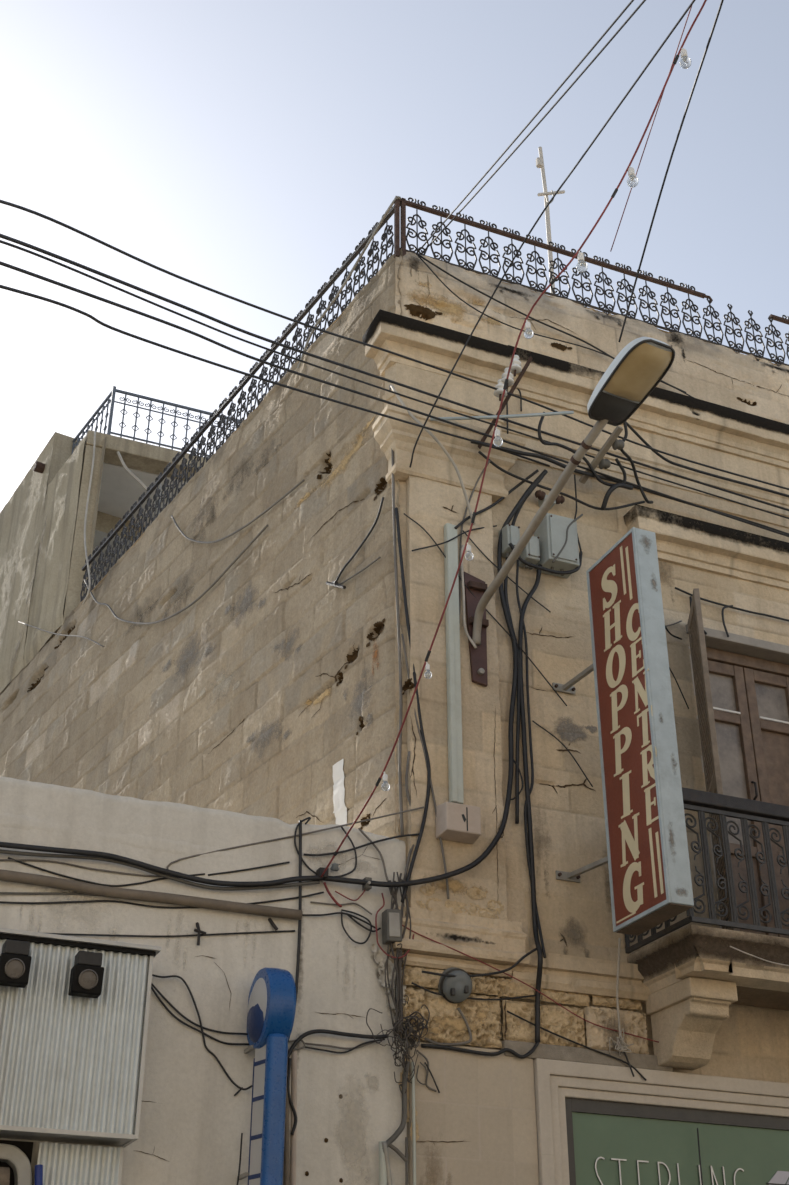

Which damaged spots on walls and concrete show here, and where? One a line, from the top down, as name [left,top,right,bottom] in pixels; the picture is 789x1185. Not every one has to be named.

spalling [404,282,500,325]
spalling [317,451,333,479]
spalling [305,618,385,707]